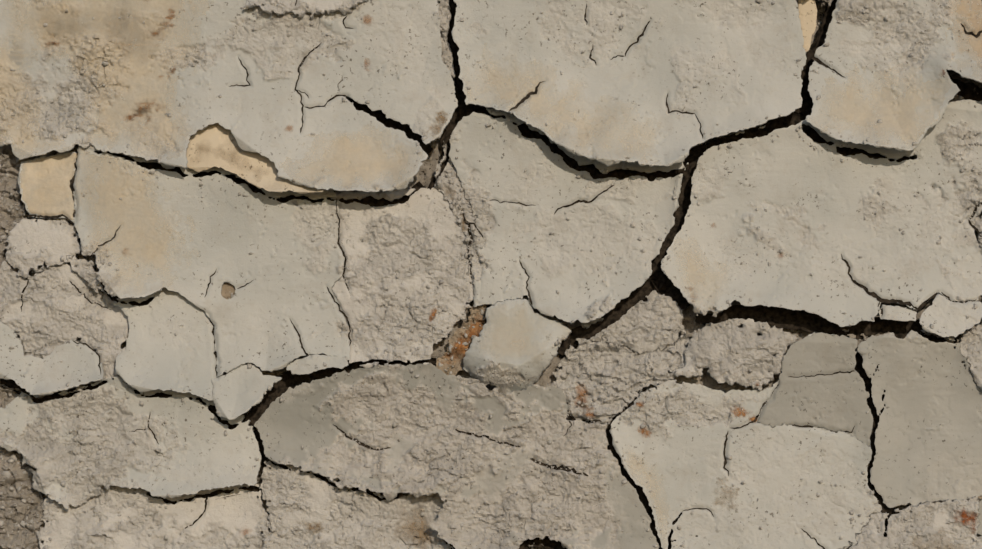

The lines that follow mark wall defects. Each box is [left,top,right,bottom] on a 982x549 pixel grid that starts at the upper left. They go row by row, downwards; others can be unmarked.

crack [949,76,982,102]
crack [95,0,977,357]
crack [1,340,108,404]
crack [70,281,155,310]
peeling [0,0,458,549]
crack [149,358,436,529]
corrosion [447,322,483,356]
crack [455,429,588,476]
crack [519,536,567,549]
peeling [254,0,982,549]
crack [565,392,714,549]
crack [789,352,902,537]